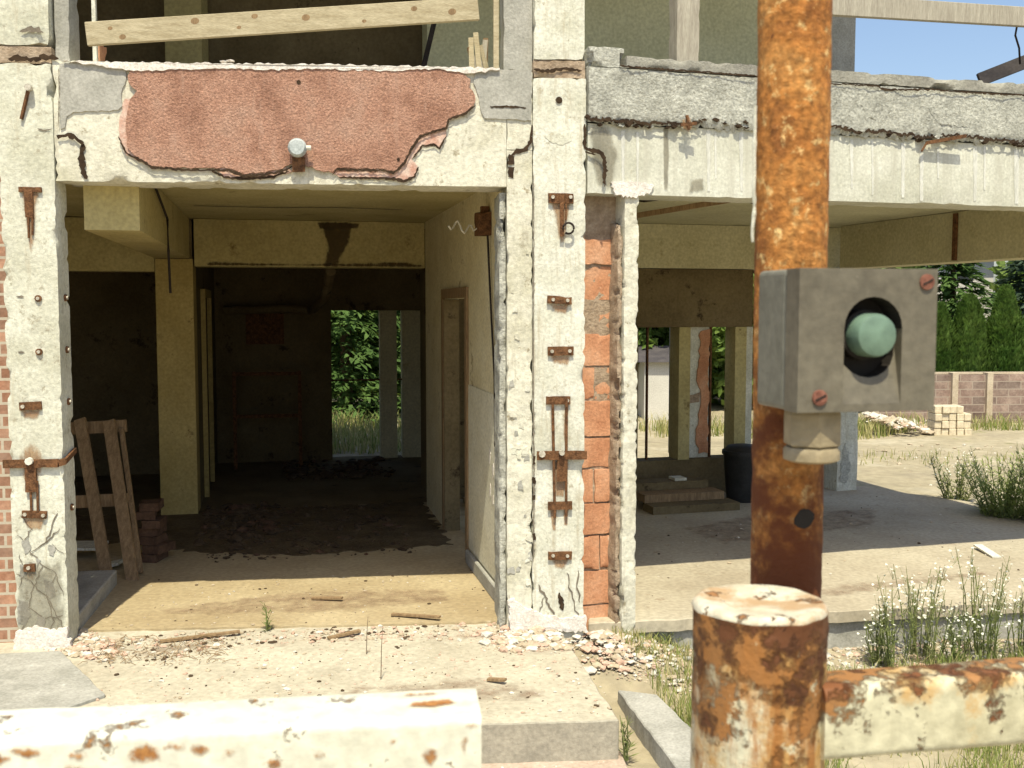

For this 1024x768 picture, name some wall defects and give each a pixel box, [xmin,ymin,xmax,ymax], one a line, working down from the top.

peeling [59,60,532,180]
spalling [831,102,1024,147]
water stain [311,222,421,267]
crack [507,125,581,615]
spalling [690,329,710,453]
rust [24,447,41,473]
rust [555,462,565,496]
crack [17,513,64,630]
rust [404,693,454,706]
rust [0,749,39,763]
rust [131,745,207,761]
rust [423,750,437,764]